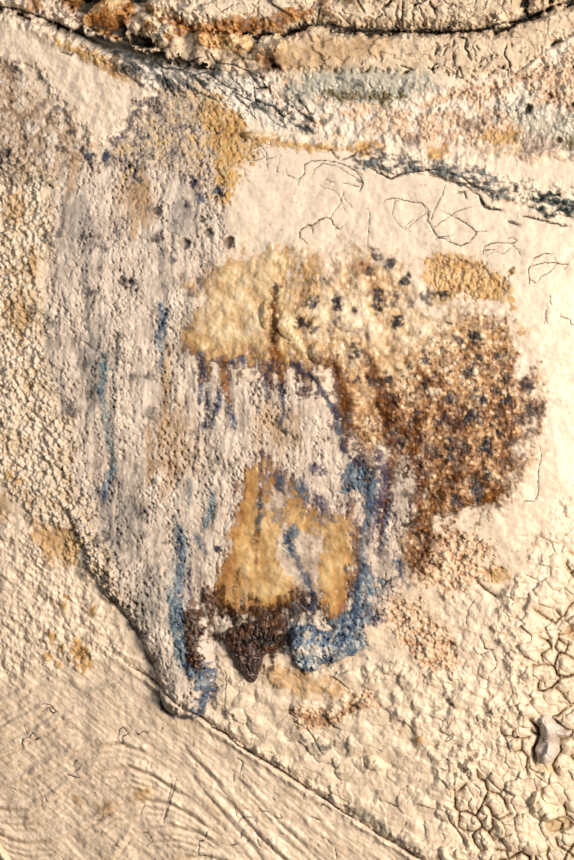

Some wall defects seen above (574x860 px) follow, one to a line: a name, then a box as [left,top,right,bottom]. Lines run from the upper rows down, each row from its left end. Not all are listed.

crack [3,6,102,45]
corrosion [63,0,313,41]
crack [216,0,571,78]
crack [244,140,574,325]
leakage [157,304,167,340]
leakage [98,353,109,443]
leakage [101,463,116,502]
leakage [159,242,546,719]
leakage [43,632,92,673]
crack [500,601,574,771]
crack [125,662,388,860]
crack [450,774,574,860]